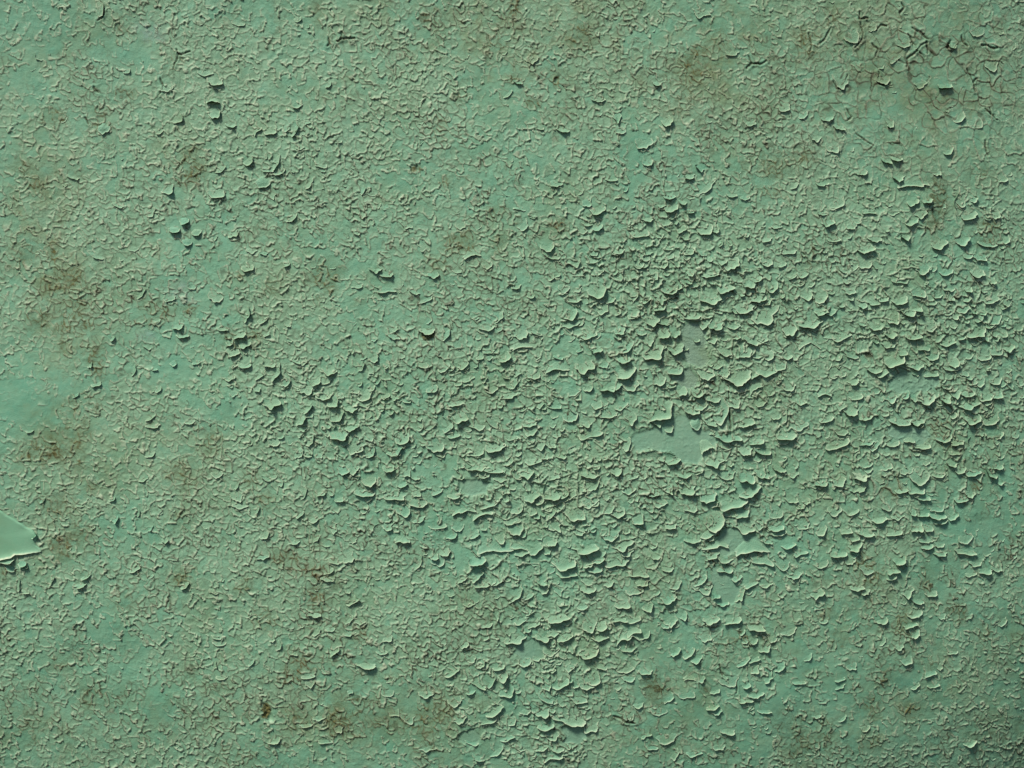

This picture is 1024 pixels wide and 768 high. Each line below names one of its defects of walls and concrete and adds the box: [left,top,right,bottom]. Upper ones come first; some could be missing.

peeling [844,22,877,56]
peeling [876,3,917,93]
peeling [913,81,953,89]
peeling [778,103,808,119]
peeling [945,99,983,128]
peeling [591,96,654,166]
peeling [810,117,846,153]
peeling [146,184,174,217]
peeling [207,188,225,198]
peeling [168,218,202,246]
peeling [216,156,1024,768]
peeling [0,510,91,594]